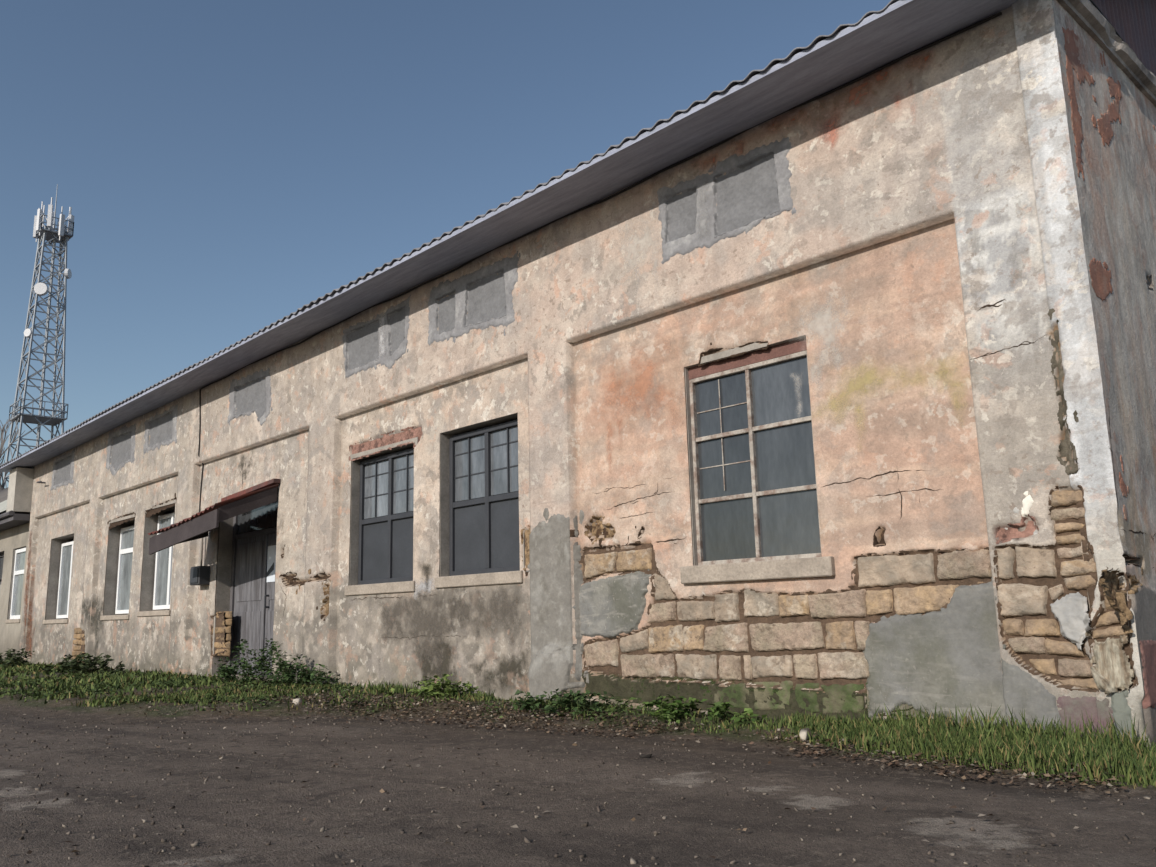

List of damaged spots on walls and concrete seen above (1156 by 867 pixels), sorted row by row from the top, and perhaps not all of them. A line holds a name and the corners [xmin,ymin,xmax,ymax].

peeling [1062,27,1122,181]
peeling [1089,258,1113,301]
crack [593,476,685,549]
flaking render [570,308,1143,721]
crack [823,470,939,519]
crack [860,548,973,556]
flaking render [279,569,331,621]
water stain [383,571,518,686]
water stain [476,656,525,691]